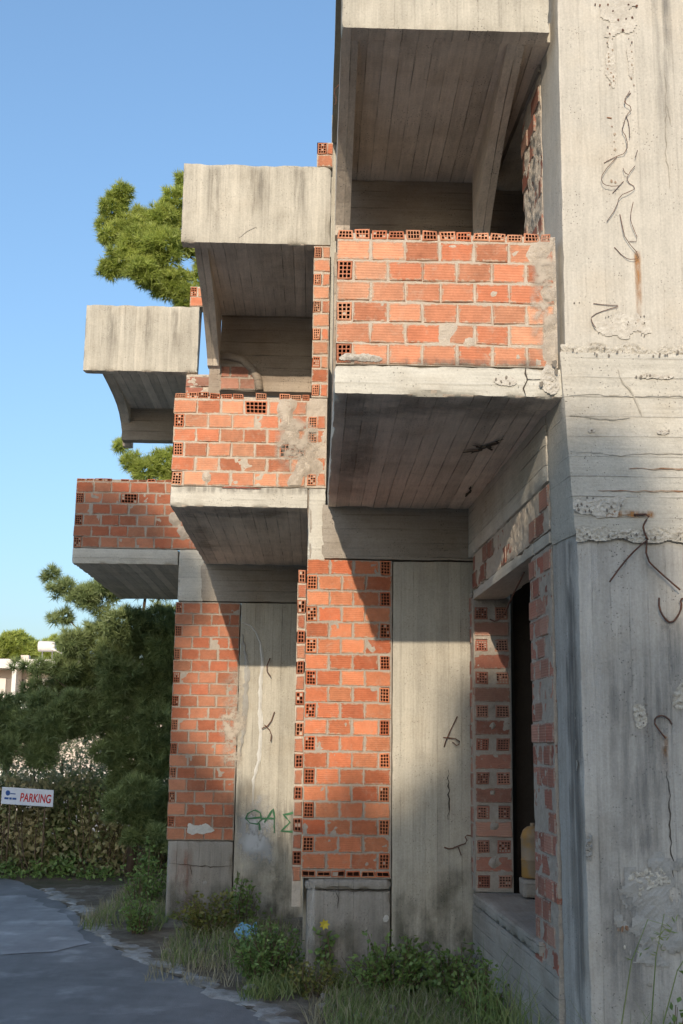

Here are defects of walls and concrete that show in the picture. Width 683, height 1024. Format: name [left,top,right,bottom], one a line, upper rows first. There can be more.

spalling [595,0,638,88]
crack [463,439,503,453]
crack [666,774,674,877]